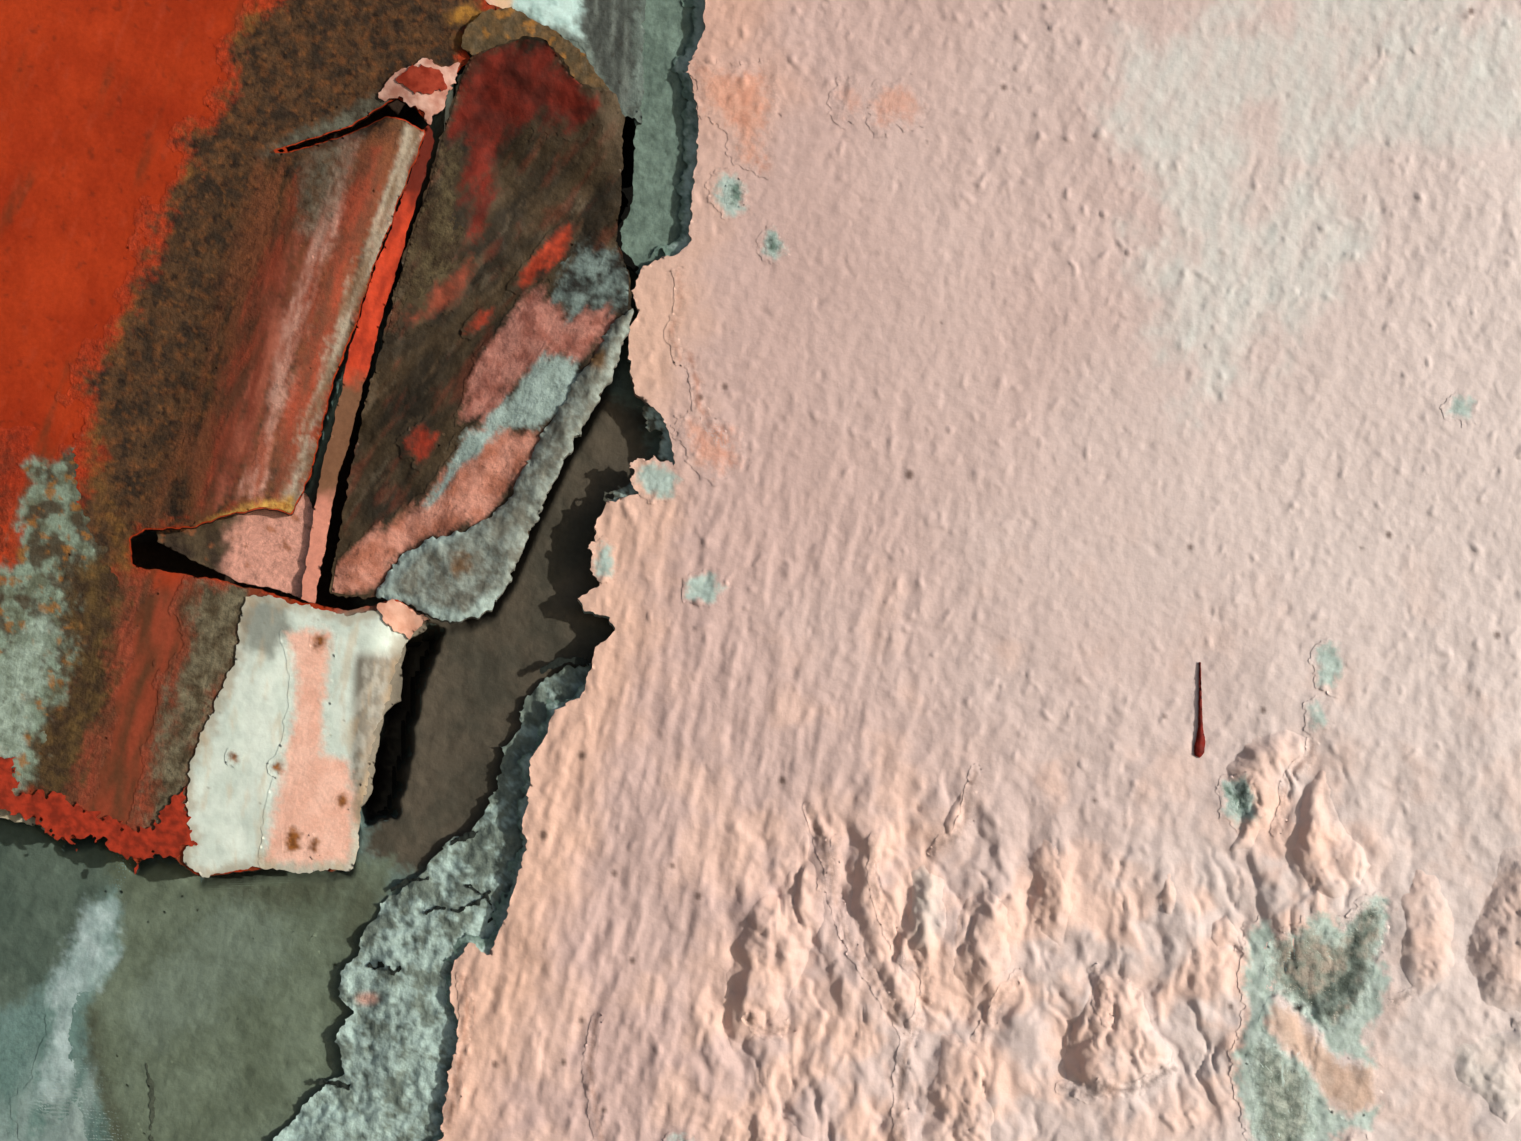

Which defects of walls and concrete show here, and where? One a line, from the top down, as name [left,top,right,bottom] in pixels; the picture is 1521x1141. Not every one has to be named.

rust [0,426,37,567]
rust [12,0,498,833]
rust [281,823,325,860]
leakage [0,381,663,1141]
peeling [0,0,753,878]
peeling [756,223,795,264]